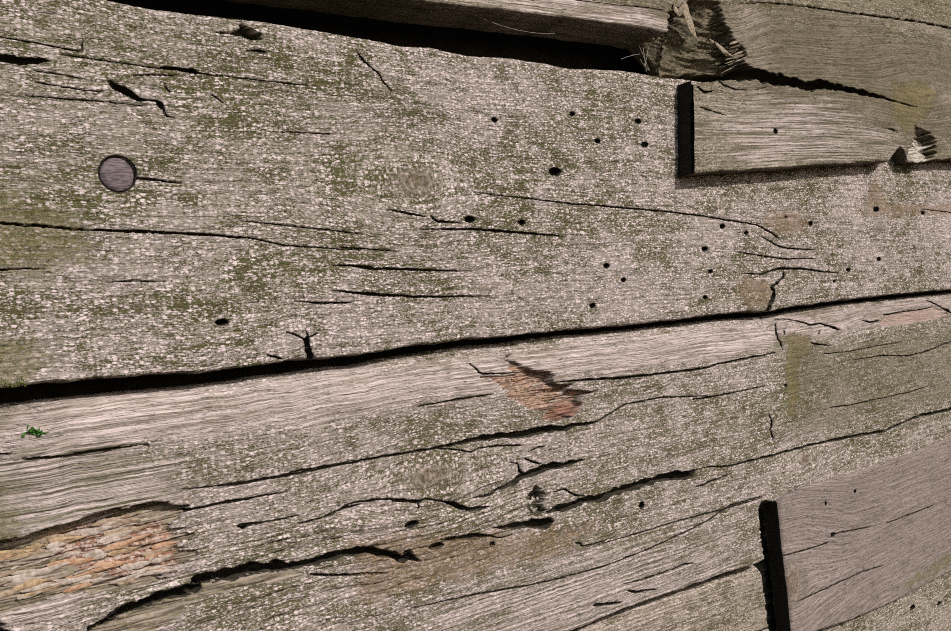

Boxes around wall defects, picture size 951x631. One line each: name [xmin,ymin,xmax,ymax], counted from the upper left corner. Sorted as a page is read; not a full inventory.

crack [0,36,312,118]
crack [357,52,391,91]
crack [178,192,951,526]
peeling [511,376,575,404]
crack [414,495,765,608]
crack [784,505,933,556]
crack [797,566,881,602]